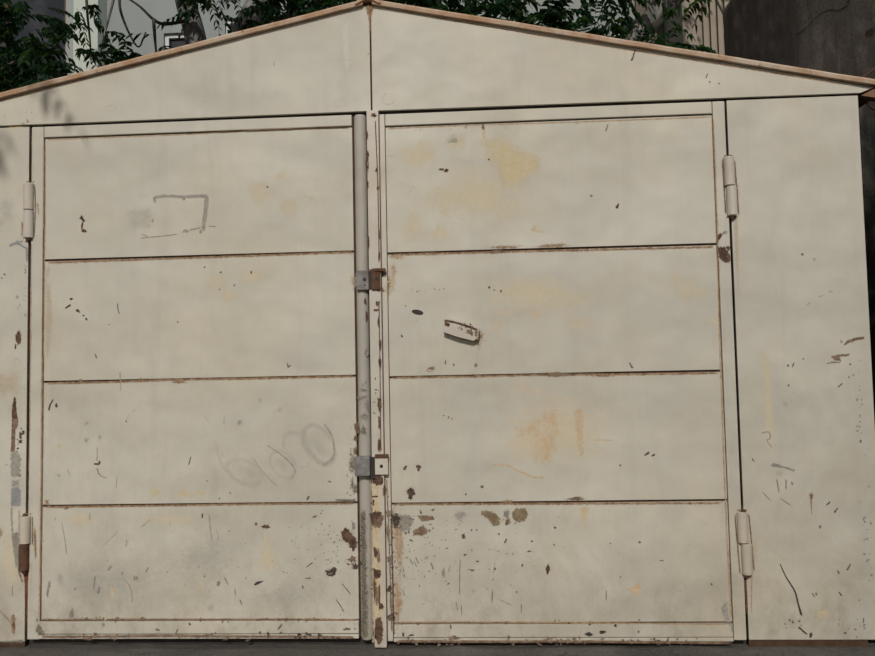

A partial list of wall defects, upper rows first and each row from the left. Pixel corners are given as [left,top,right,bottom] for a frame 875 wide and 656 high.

corrosion [349,113,759,647]
peeling [390,508,478,560]
peeling [481,508,532,543]